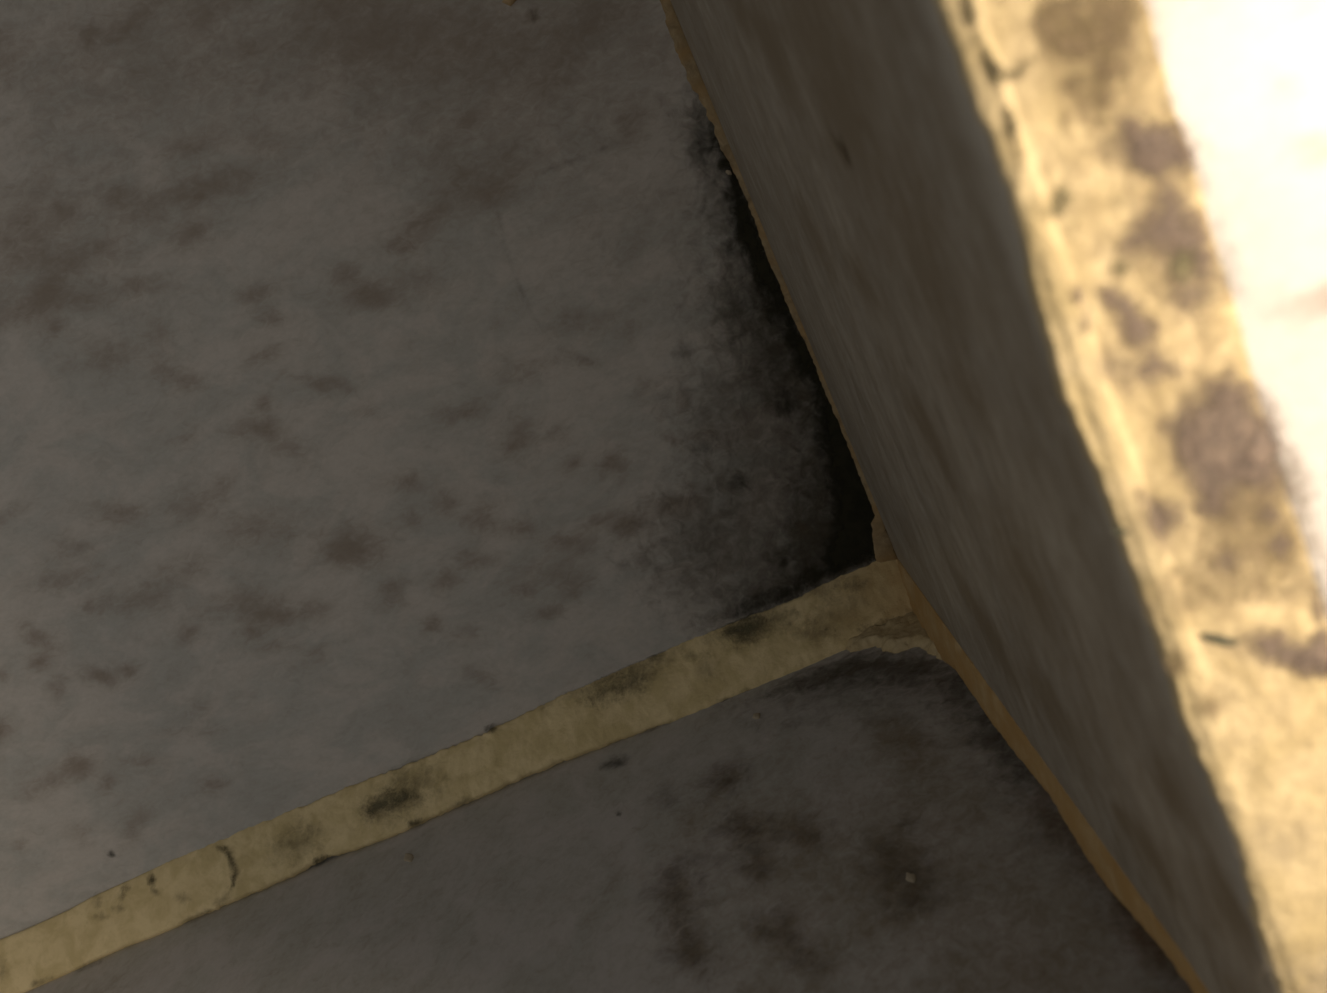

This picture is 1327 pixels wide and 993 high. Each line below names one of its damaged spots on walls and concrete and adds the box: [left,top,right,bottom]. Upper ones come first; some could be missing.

leakage [1101,122,1211,383]
leakage [695,136,876,640]
leakage [1148,498,1184,538]
leakage [1167,380,1301,574]
leakage [1247,591,1327,678]